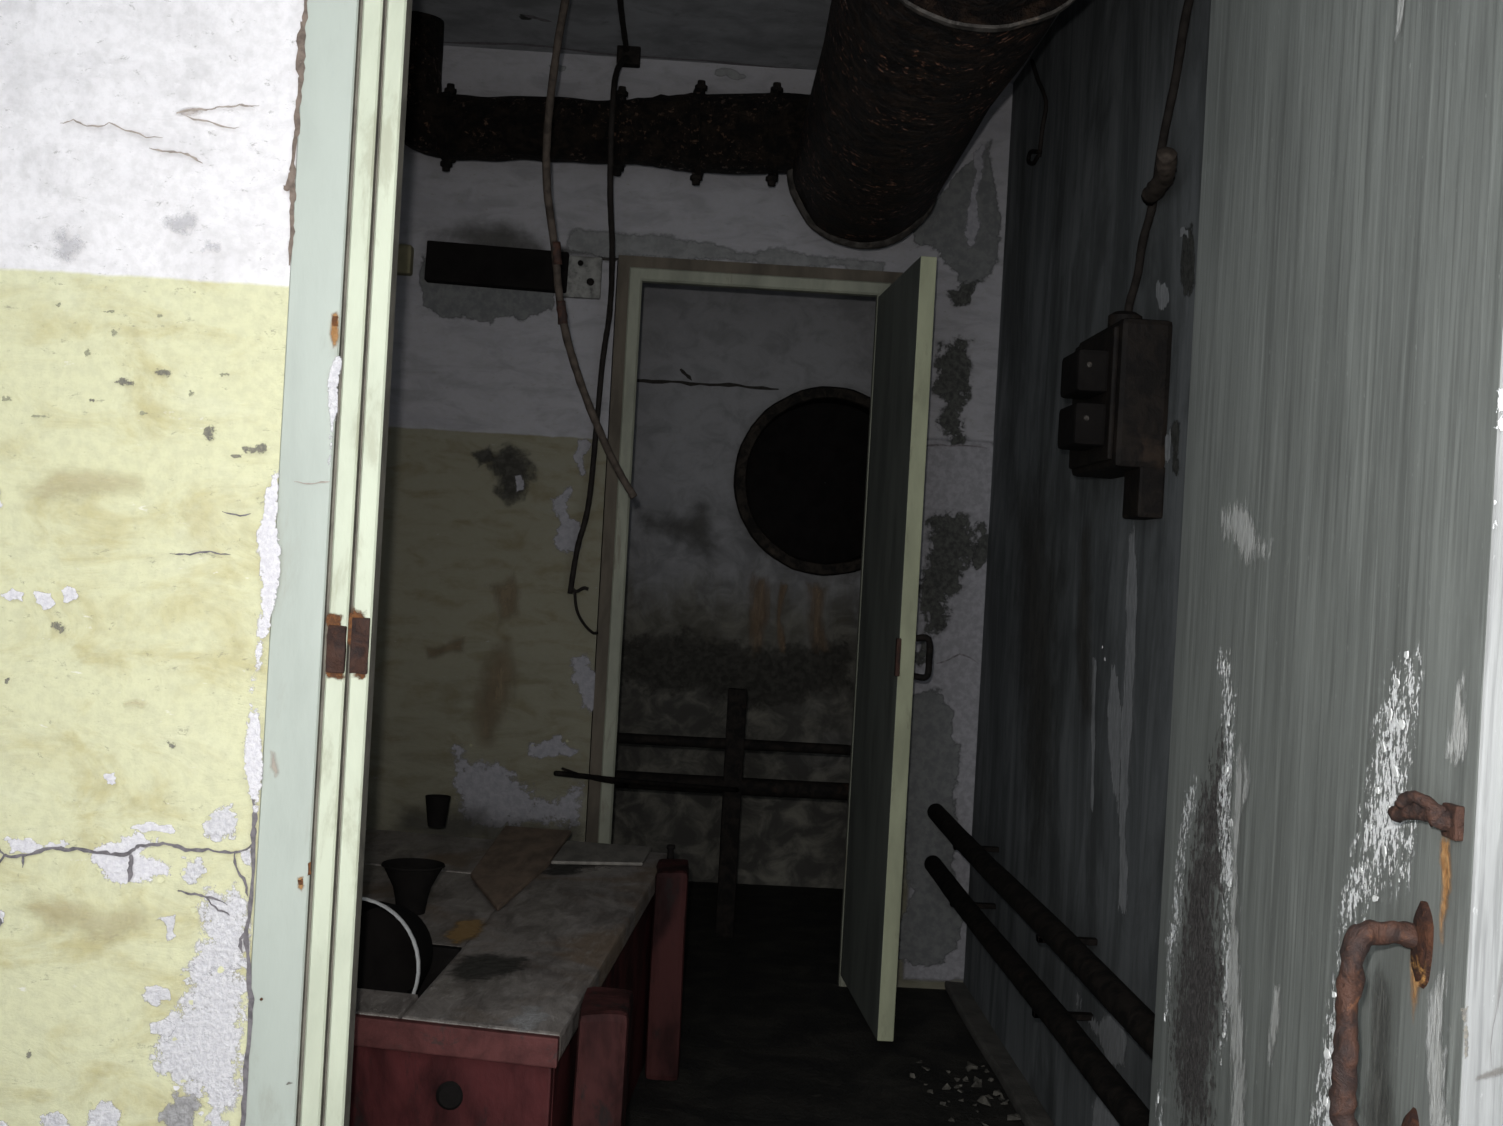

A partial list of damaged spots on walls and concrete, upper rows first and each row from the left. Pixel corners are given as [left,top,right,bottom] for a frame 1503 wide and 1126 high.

crack [63,104,259,164]
rust [326,608,365,646]
peeling [90,473,281,1126]
crack [0,827,257,915]
rust [1440,838,1450,927]
peeling [40,1100,122,1126]